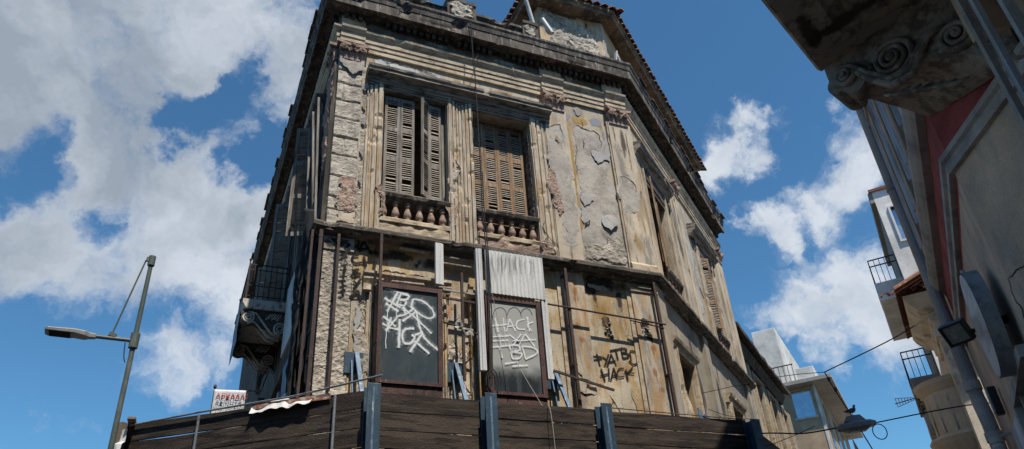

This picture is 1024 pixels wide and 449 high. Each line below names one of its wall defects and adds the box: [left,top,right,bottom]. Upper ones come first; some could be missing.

flaking render [524,8,601,55]
flaking render [326,57,442,224]
flaking render [540,107,640,266]